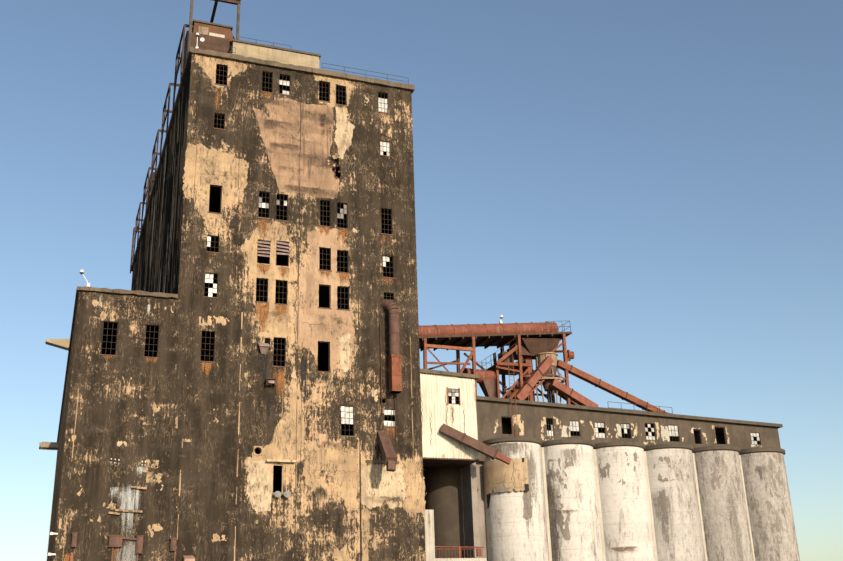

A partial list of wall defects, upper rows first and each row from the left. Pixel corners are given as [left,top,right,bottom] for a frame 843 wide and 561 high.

peeling [253,74,355,199]
peeling [150,141,249,293]
peeling [512,414,524,436]
peeling [541,416,570,441]
peeling [631,422,670,445]
peeling [245,367,427,561]
peeling [599,453,626,486]
peeling [654,456,684,482]
peeling [546,450,574,540]
damp [653,493,670,529]